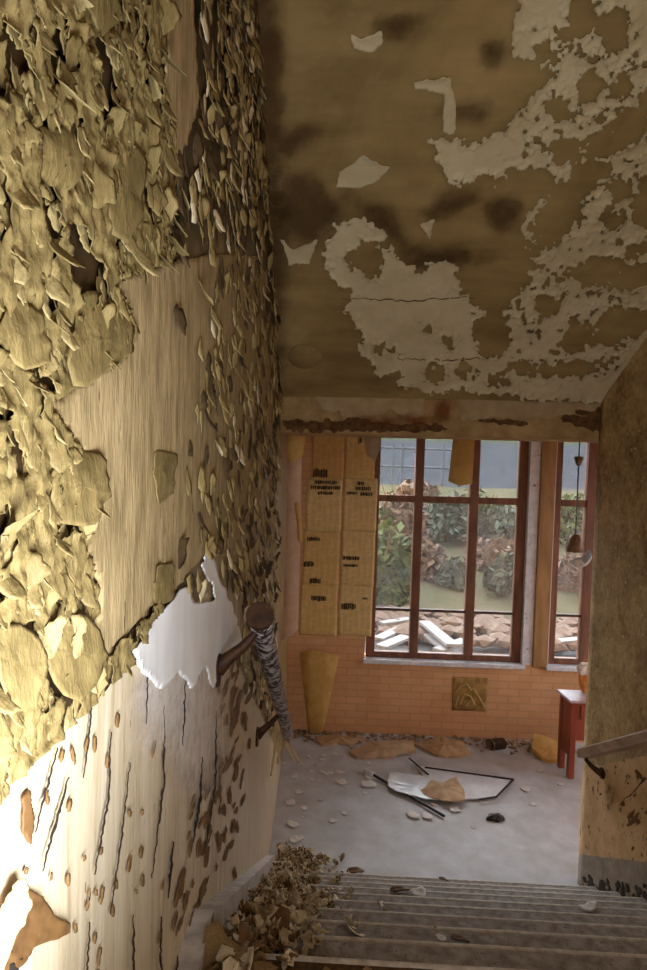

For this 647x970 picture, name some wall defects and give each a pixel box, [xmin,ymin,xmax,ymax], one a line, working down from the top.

peeling [351,31,383,53]
damp [260,36,308,185]
peeling [414,0,647,189]
damp [372,209,398,235]
damp [433,252,466,263]
peeling [280,128,647,434]
peeling [21,790,50,845]
spalling [188,736,246,867]
peeling [0,867,78,970]
spalling [86,880,118,917]
spalling [172,863,218,936]
peeling [202,905,290,970]